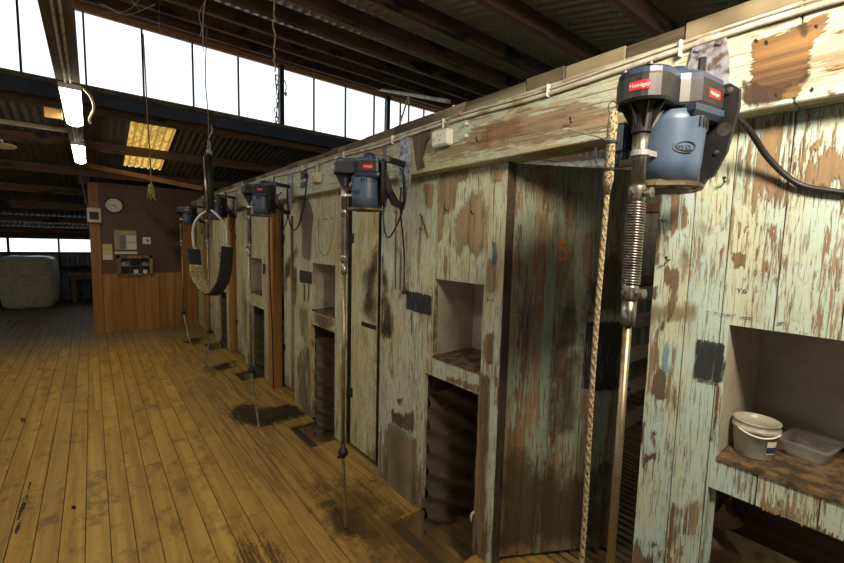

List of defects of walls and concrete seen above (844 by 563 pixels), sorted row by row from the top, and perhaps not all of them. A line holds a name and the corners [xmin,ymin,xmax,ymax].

peeling [748,13,844,99]
peeling [412,90,626,171]
peeling [424,168,495,293]
peeling [542,168,592,290]
peeling [653,194,689,331]
peeling [727,108,844,295]
peeling [297,345,311,416]
peeling [641,368,668,468]
peeling [697,379,720,441]
peeling [632,494,700,563]
peeling [762,498,844,542]